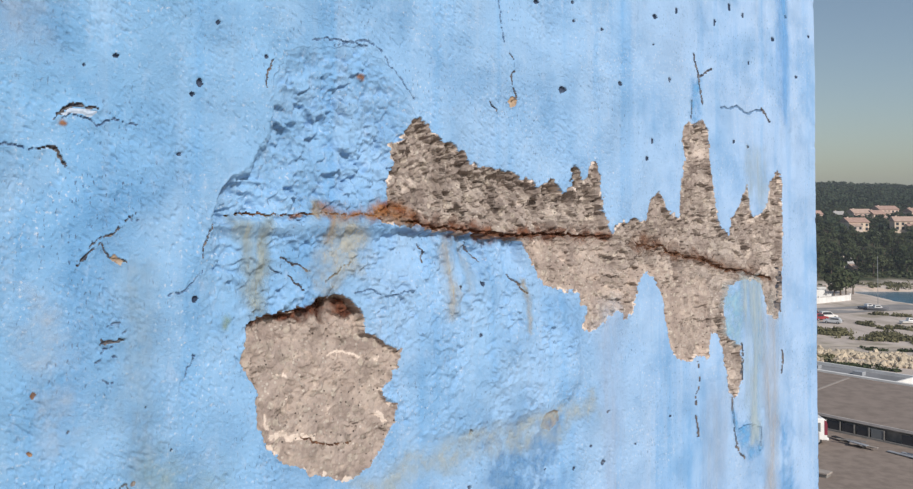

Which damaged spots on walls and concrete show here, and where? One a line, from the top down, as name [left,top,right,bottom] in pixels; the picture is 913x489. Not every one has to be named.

crack [53,102,138,127]
crack [312,37,415,100]
crack [690,53,771,123]
crack [0,142,67,168]
crack [76,212,139,267]
crack [167,211,382,297]
rust [321,204,566,240]
spalling [212,45,783,399]
spalling [239,294,403,483]
crack [694,361,702,437]